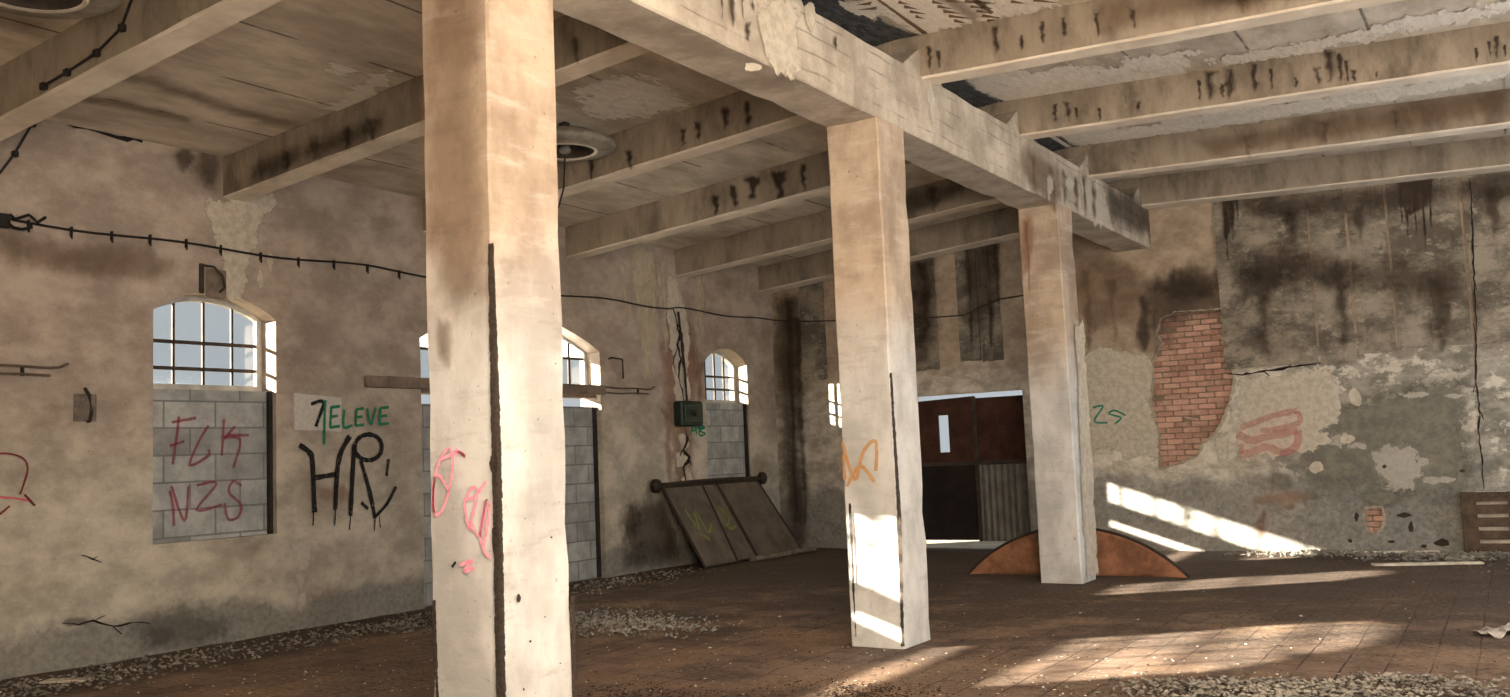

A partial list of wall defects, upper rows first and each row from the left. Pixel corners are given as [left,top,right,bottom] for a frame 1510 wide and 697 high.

peeling [745,0,816,84]
peeling [839,0,1063,35]
leakage [1197,64,1273,99]
leakage [1314,51,1356,83]
leakage [910,262,933,354]
leakage [965,244,999,339]
leakage [1223,179,1510,347]
crack [673,309,692,481]
spalling [1148,307,1236,470]
peeling [1339,433,1355,444]
peeling [1348,387,1362,406]